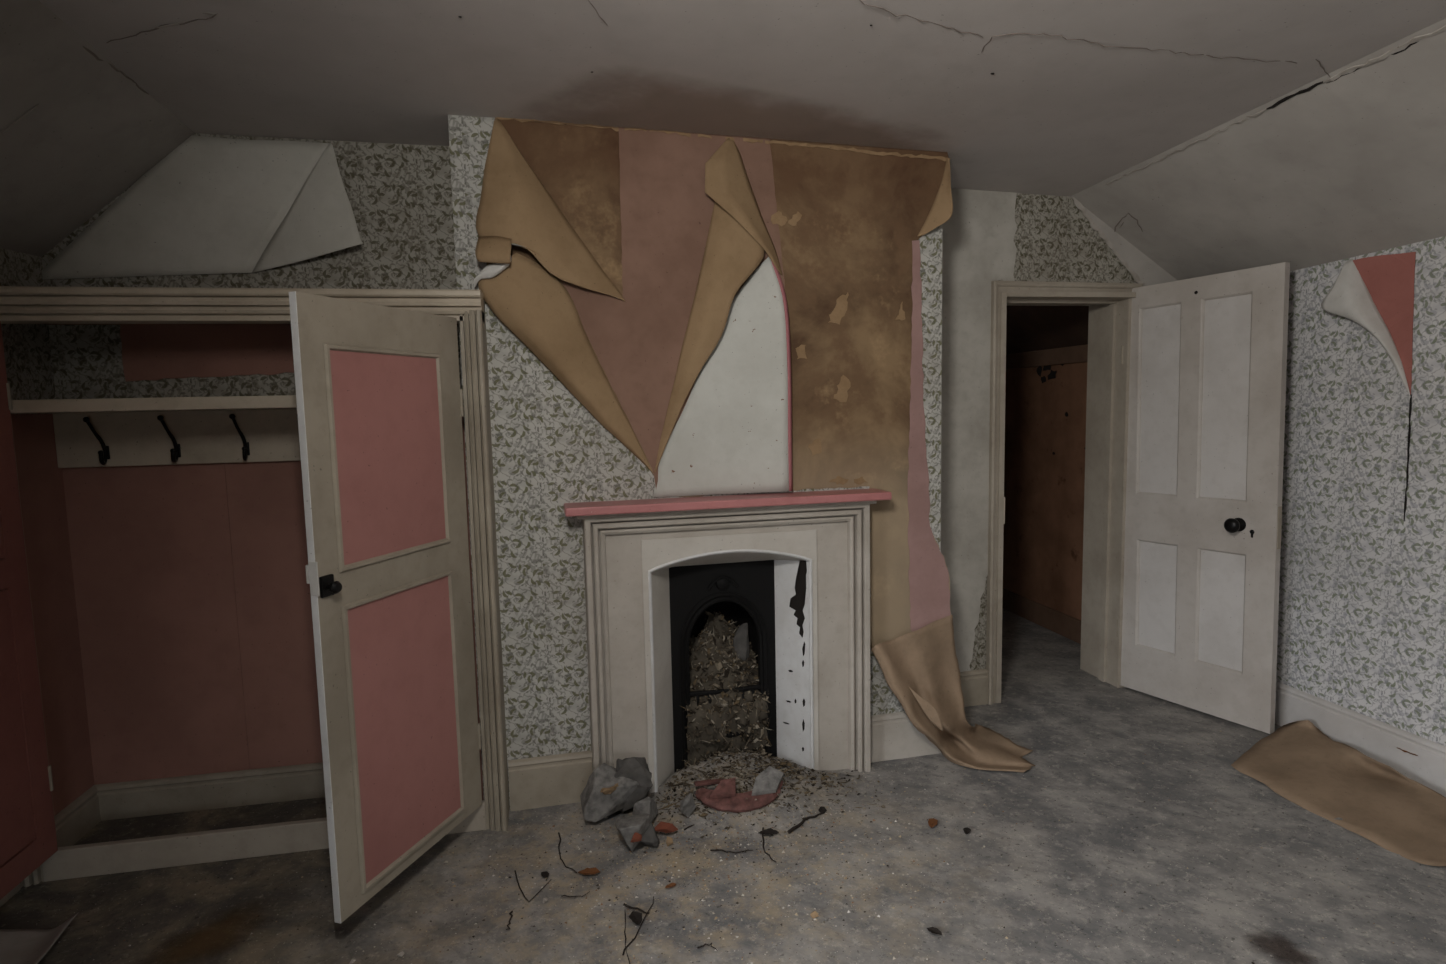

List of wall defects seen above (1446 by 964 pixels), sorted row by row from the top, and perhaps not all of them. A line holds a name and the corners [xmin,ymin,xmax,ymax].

crack [859,0,1331,78]
peeling [828,293,849,325]
flaking render [941,188,1017,672]
spalling [788,560,807,672]
spalling [695,766,784,813]
crack [623,912,631,964]